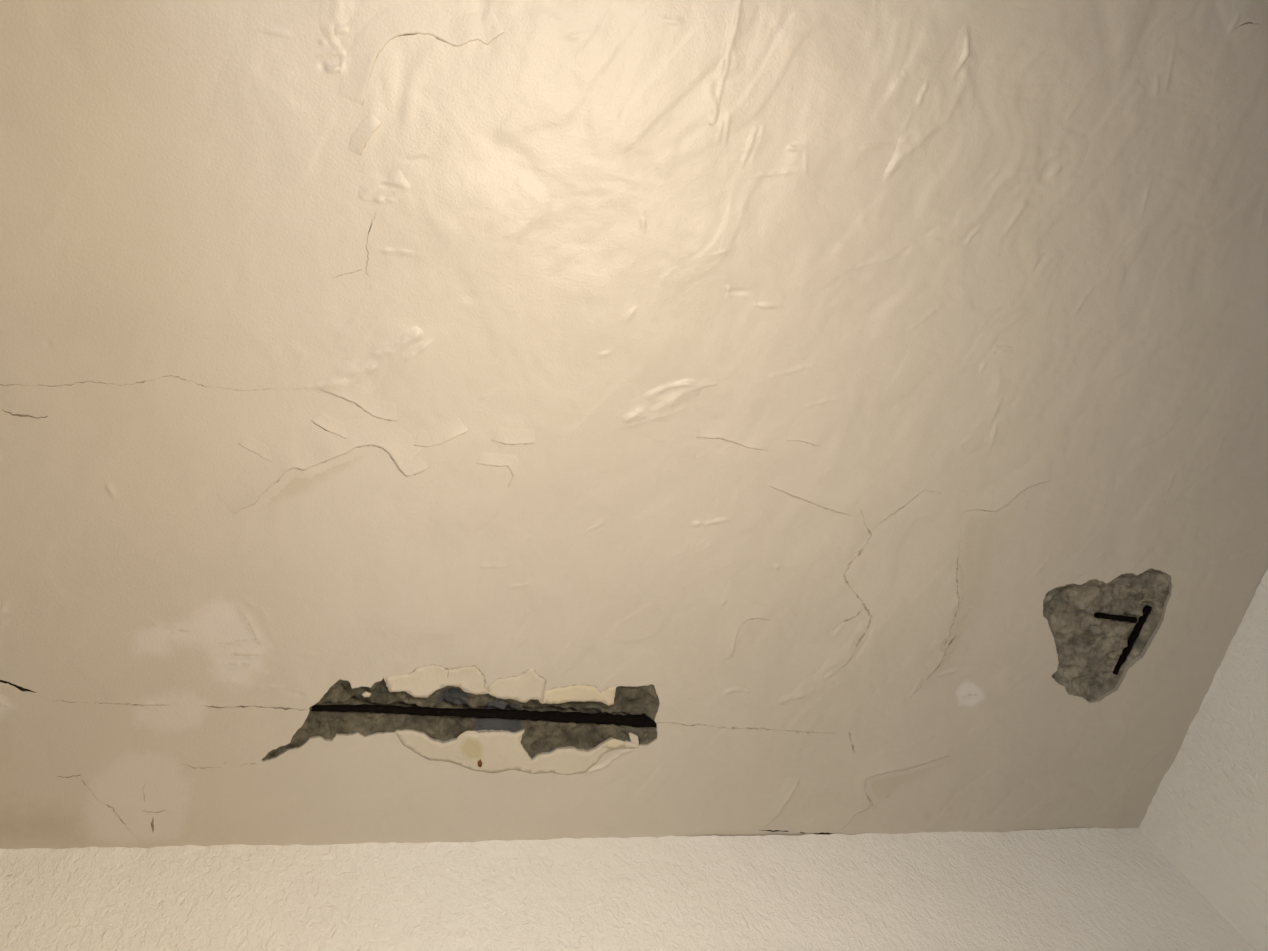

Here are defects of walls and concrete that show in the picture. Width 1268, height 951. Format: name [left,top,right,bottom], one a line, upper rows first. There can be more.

crack [0,375,307,419]
crack [828,490,941,673]
crack [915,538,961,693]
spalling [1043,568,1172,703]
crack [0,680,177,706]
leakage [0,539,300,849]
crack [207,704,300,712]
spalling [261,664,660,775]
crack [658,722,855,753]